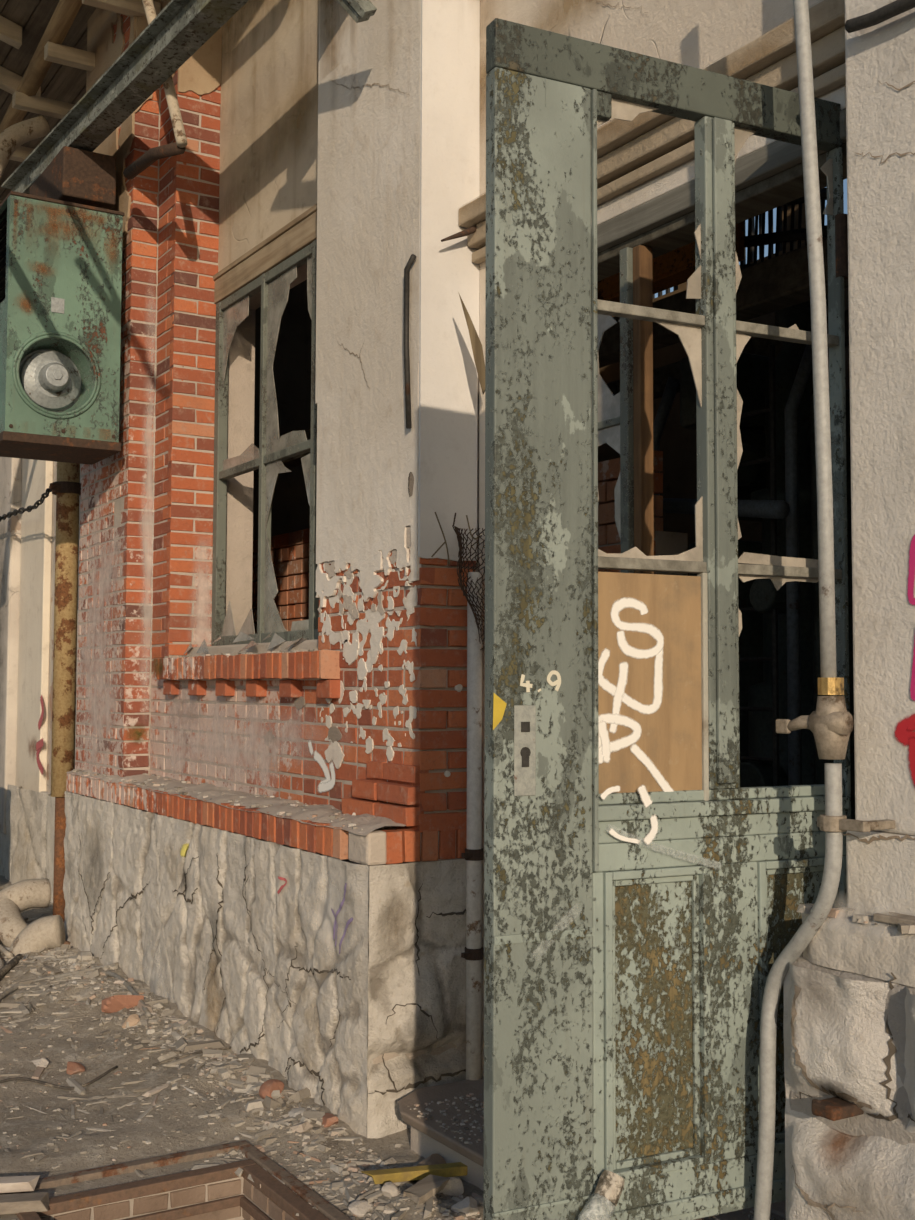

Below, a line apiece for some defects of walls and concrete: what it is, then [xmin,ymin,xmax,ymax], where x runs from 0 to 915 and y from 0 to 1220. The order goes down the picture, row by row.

flaking render [86,8,148,92]
flaking render [172,27,222,96]
crack [332,68,410,96]
flaking render [93,94,153,250]
crack [857,152,915,164]
flaking render [318,526,418,769]
crack [78,821,351,1105]
crack [414,883,466,974]
crack [386,1003,438,1040]
crack [368,1054,466,1095]
crack [790,972,915,1122]
crack [790,1162,863,1220]